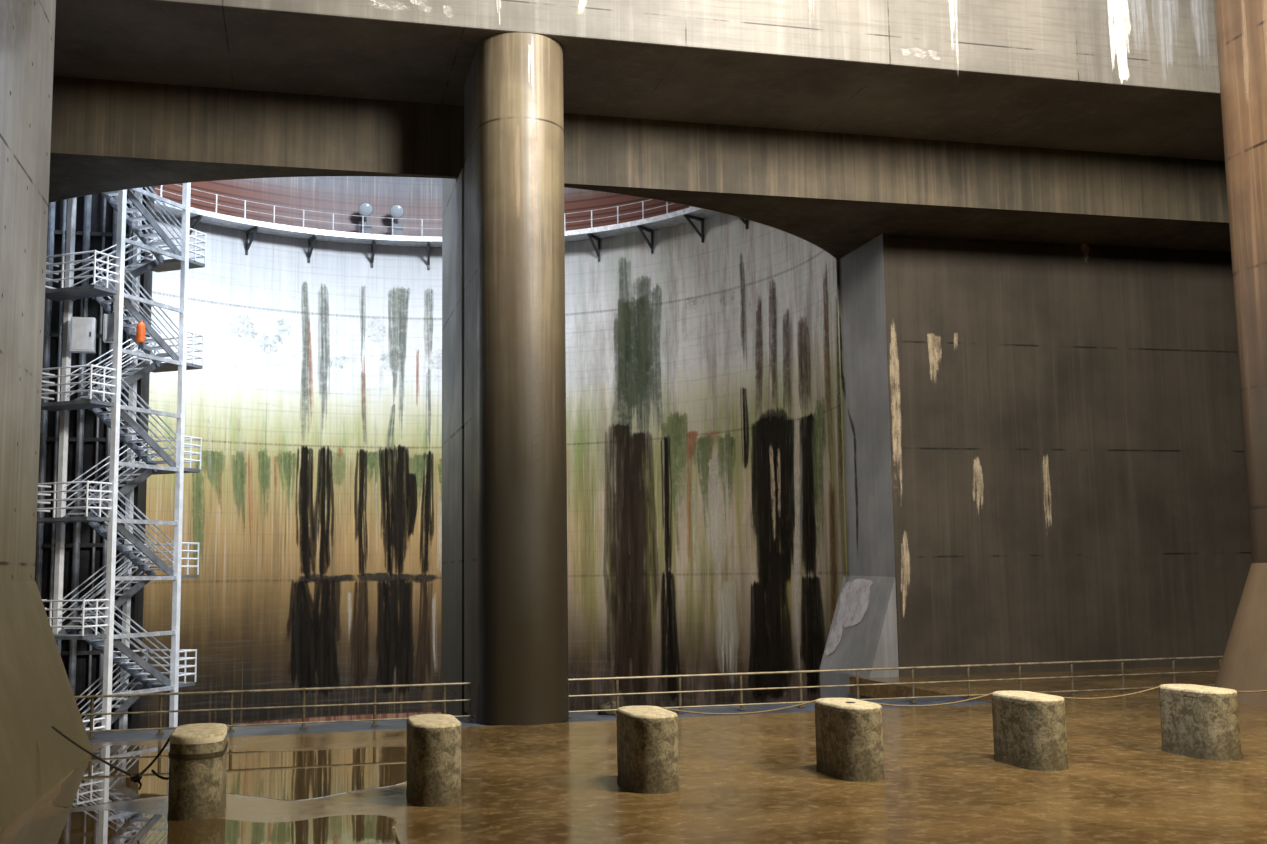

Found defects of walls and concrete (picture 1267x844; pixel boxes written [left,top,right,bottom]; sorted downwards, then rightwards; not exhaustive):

efflorescence [1108,0,1131,83]
water stain [287,445,436,694]
water stain [661,437,681,701]
water stain [740,388,873,701]